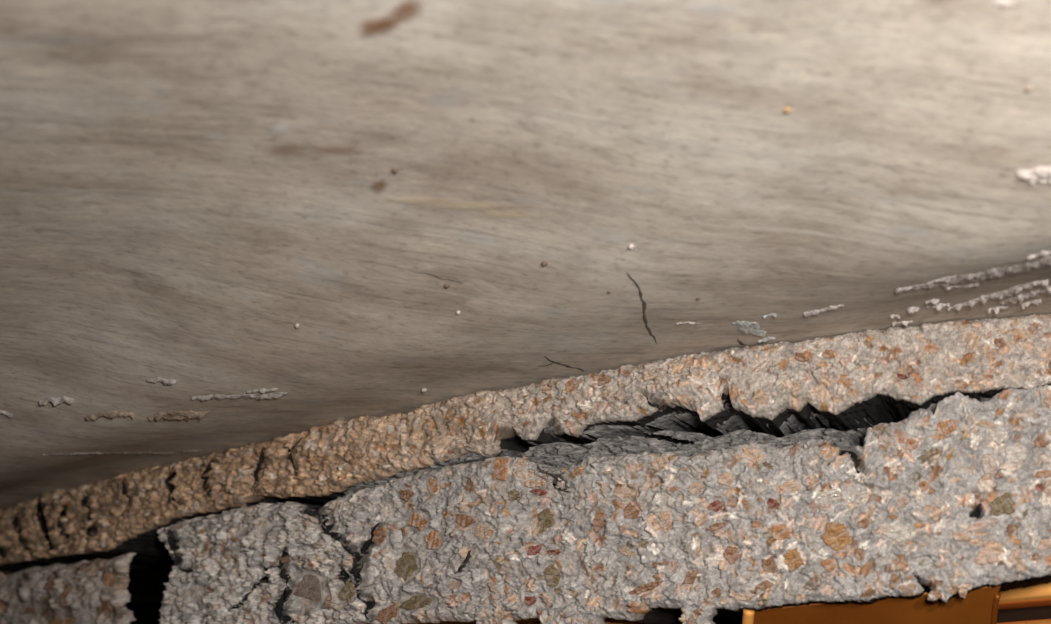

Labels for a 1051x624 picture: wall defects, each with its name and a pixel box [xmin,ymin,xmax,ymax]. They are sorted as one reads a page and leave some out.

corrosion [366,3,416,33]
crack [627,273,657,343]
crack [927,403,937,414]
crack [0,493,98,558]
crack [122,480,132,516]
crack [164,463,181,505]
crack [201,459,216,497]
crack [253,438,301,492]
crack [302,393,876,620]
crack [166,529,193,574]
crack [229,547,296,624]